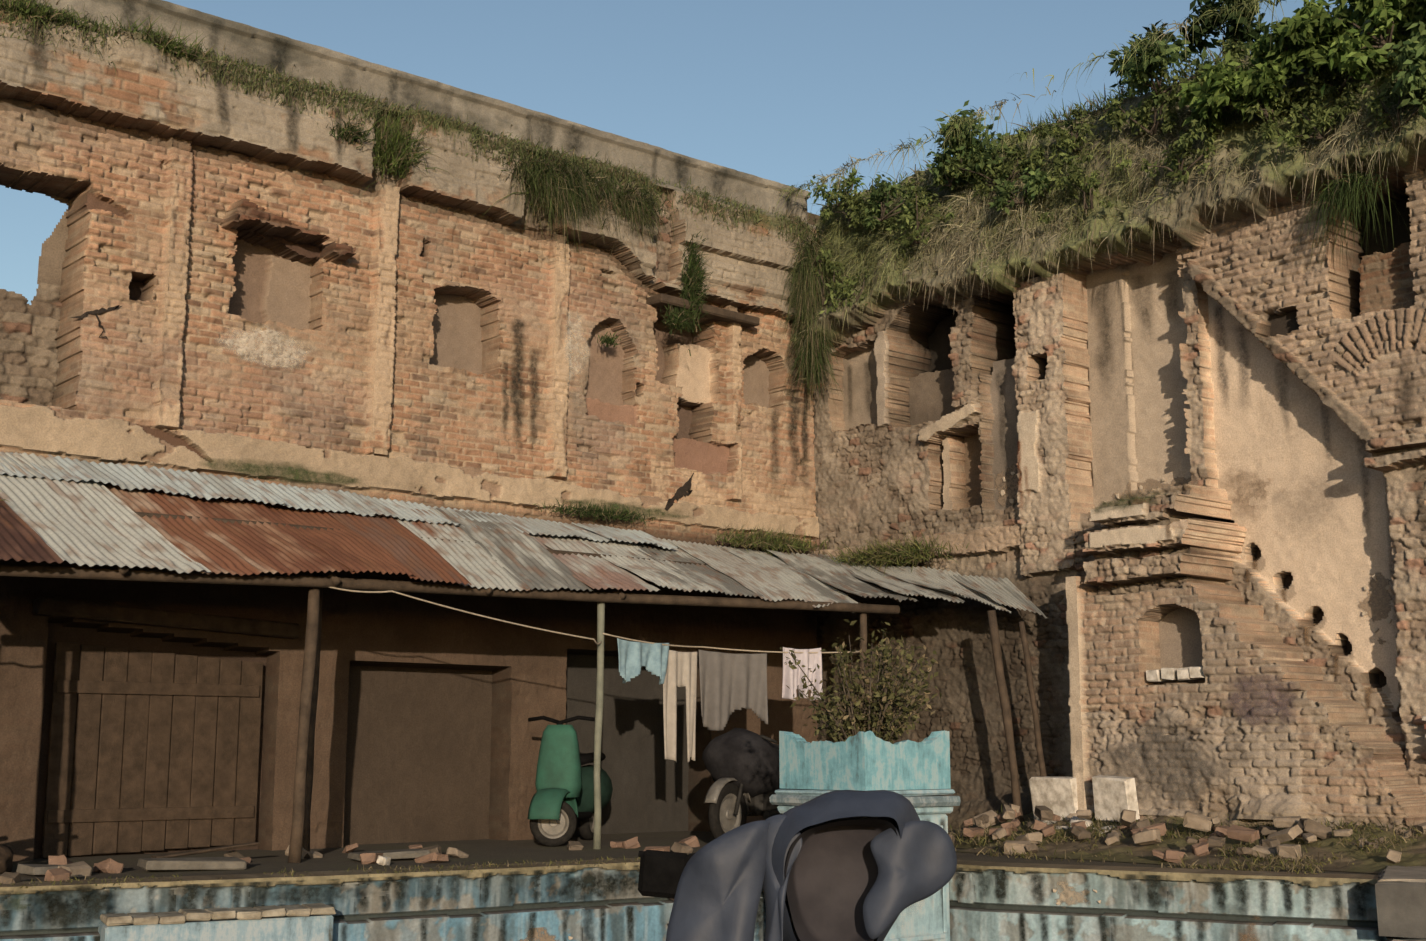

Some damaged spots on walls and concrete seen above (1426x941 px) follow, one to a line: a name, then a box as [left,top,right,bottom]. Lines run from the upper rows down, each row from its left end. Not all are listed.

damp [504,320,538,436]
damp [149,880,339,912]
damp [355,875,461,939]
spalling [520,927,573,941]
damp [472,865,638,941]